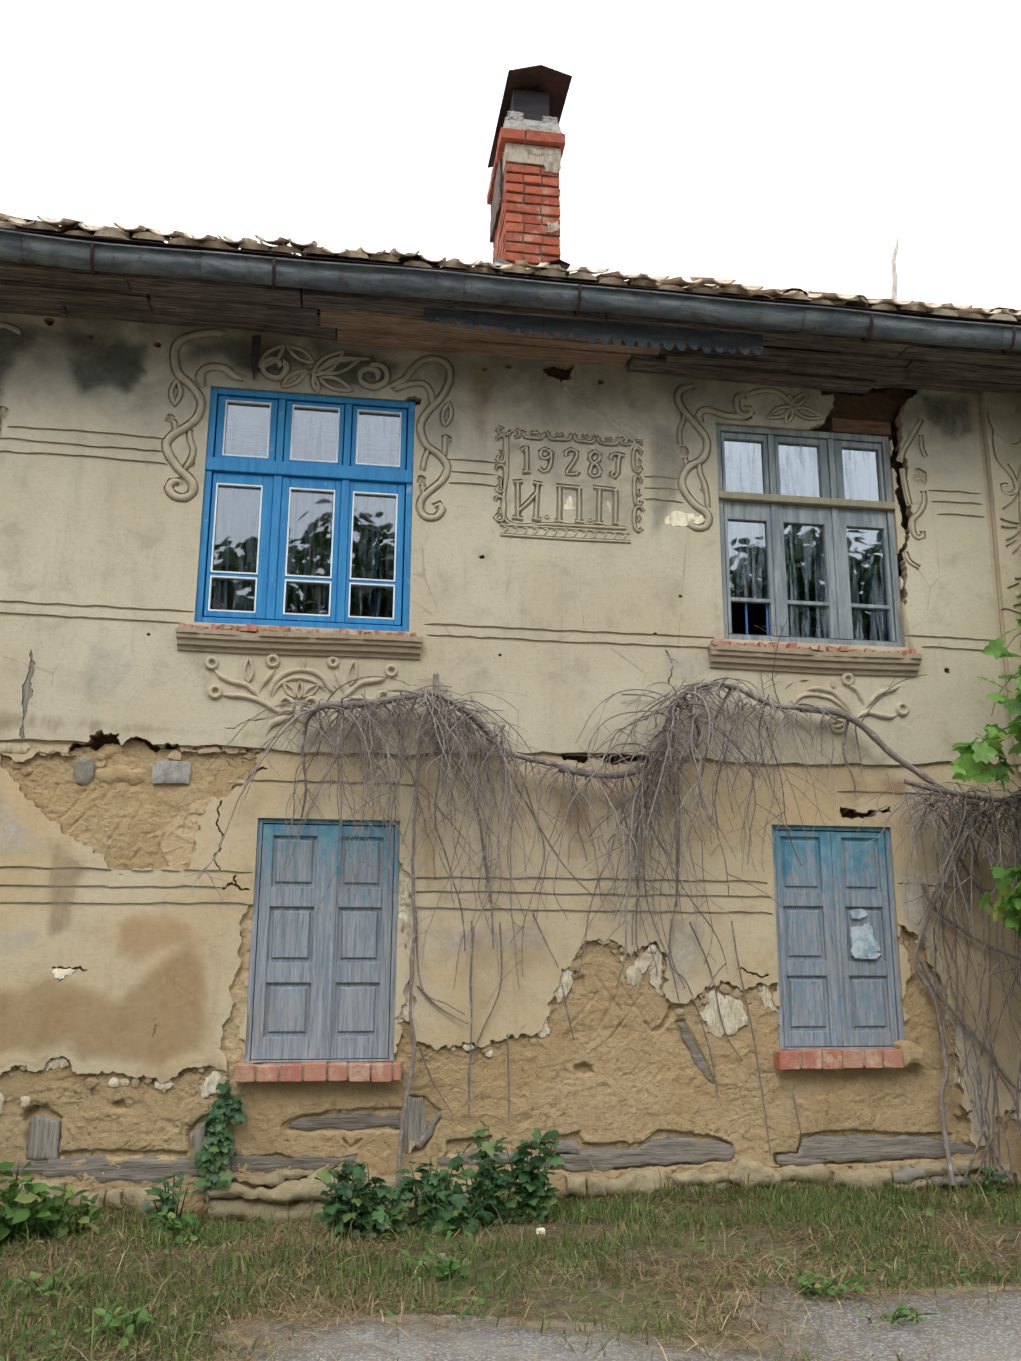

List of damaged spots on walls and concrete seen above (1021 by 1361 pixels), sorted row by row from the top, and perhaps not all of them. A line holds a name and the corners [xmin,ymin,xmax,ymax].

spalling [19,650,35,741]
flaking render [1,739,260,875]
crack [214,767,267,891]
flaking render [0,863,1021,1223]